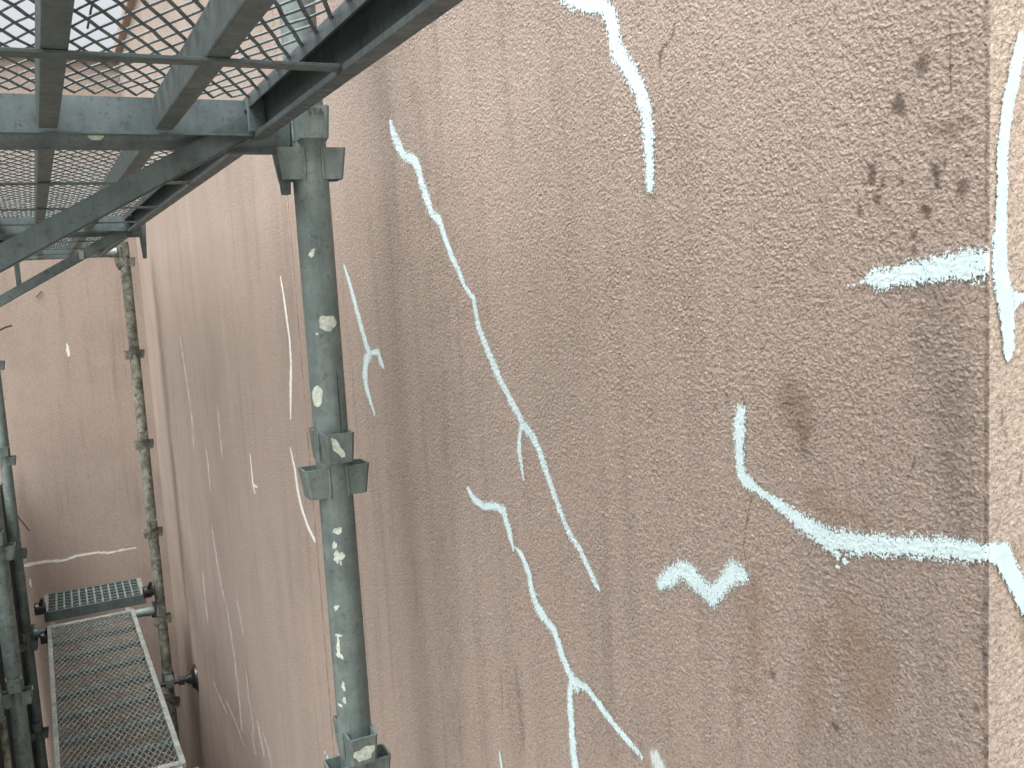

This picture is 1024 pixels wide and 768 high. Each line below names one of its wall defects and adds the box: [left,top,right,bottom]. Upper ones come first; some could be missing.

crack [558,0,675,194]
crack [847,31,1024,362]
crack [343,264,385,416]
crack [389,118,600,592]
crack [467,485,664,768]
crack [655,545,752,611]
crack [732,403,1024,616]